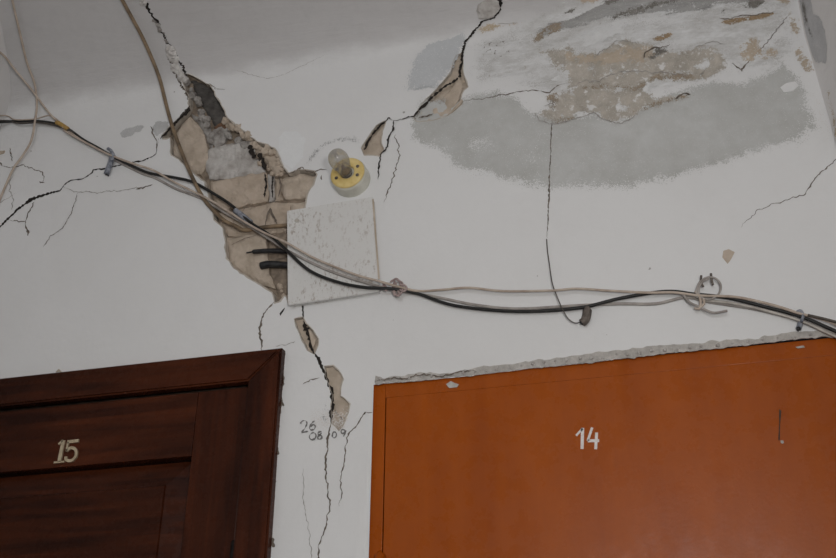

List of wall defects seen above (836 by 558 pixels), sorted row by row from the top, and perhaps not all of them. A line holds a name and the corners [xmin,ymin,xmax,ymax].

crack [0,0,191,247]
crack [377,0,503,201]
flaking render [413,53,468,122]
crack [465,84,561,101]
peeling [532,0,770,125]
peeling [799,0,827,64]
flaking render [161,74,317,304]
crack [258,302,304,350]
flaking render [294,316,319,355]
flaking render [324,365,351,431]
crack [302,352,372,558]